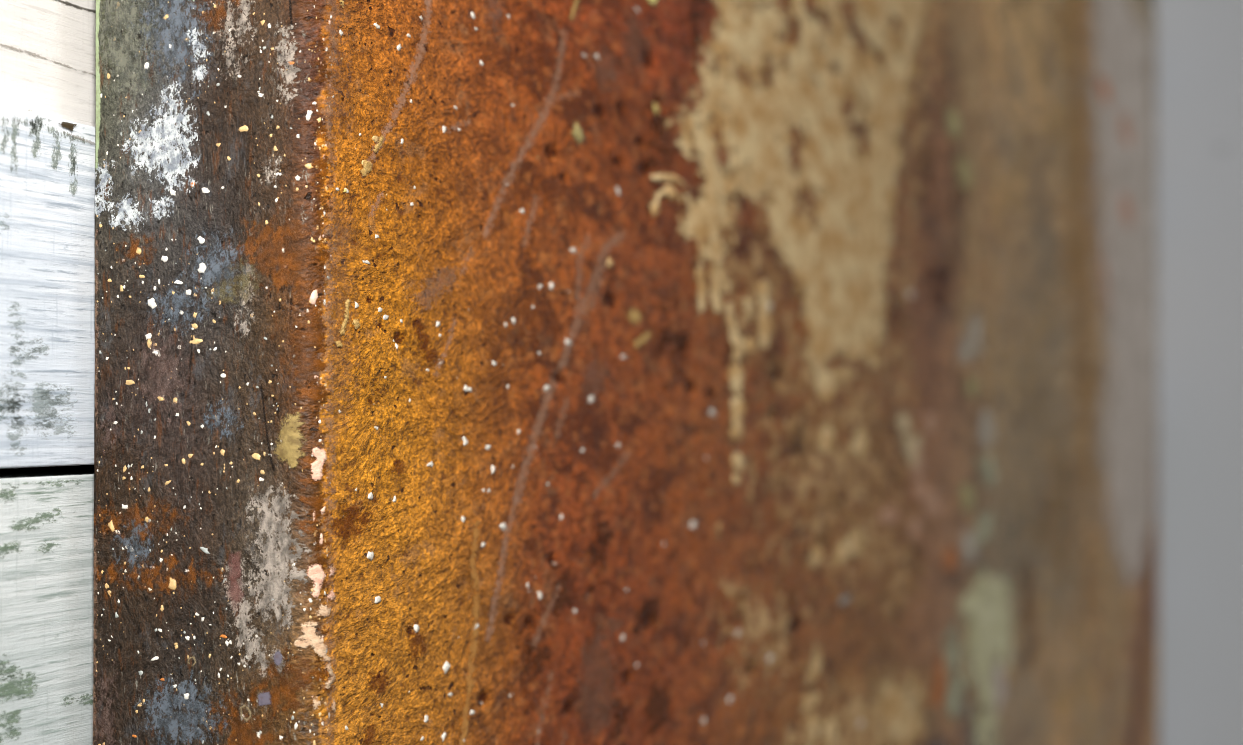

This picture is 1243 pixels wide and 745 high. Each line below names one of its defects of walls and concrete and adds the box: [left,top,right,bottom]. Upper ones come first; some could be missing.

corrosion [193,0,242,33]
peeling [572,124,584,143]
corrosion [115,230,157,268]
corrosion [233,122,333,416]
peeling [635,0,933,485]
corrosion [412,318,438,363]
corrosion [391,458,407,480]
spalling [878,410,944,541]
corrosion [94,494,226,598]
corrosion [208,448,372,745]
corrosion [408,619,426,661]
corrosion [366,668,389,693]